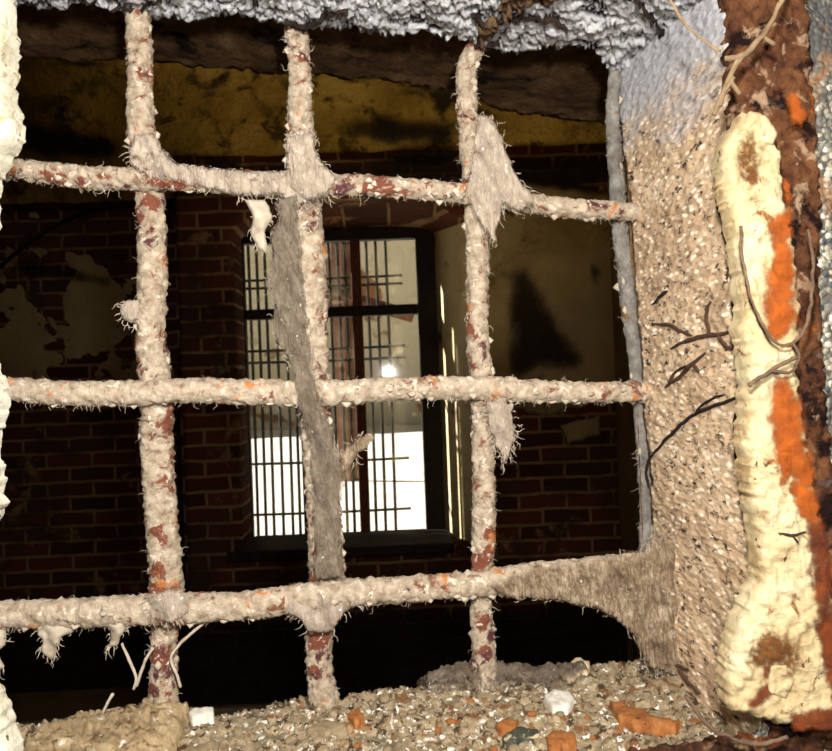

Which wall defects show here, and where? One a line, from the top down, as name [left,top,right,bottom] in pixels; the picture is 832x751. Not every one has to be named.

flaking render [0,0,26,230]
corrosion [788,93,806,124]
corrosion [763,181,798,340]
flaking render [0,247,139,520]
corrosion [768,376,832,731]
flaking render [0,683,24,751]
corrosion [749,665,771,707]